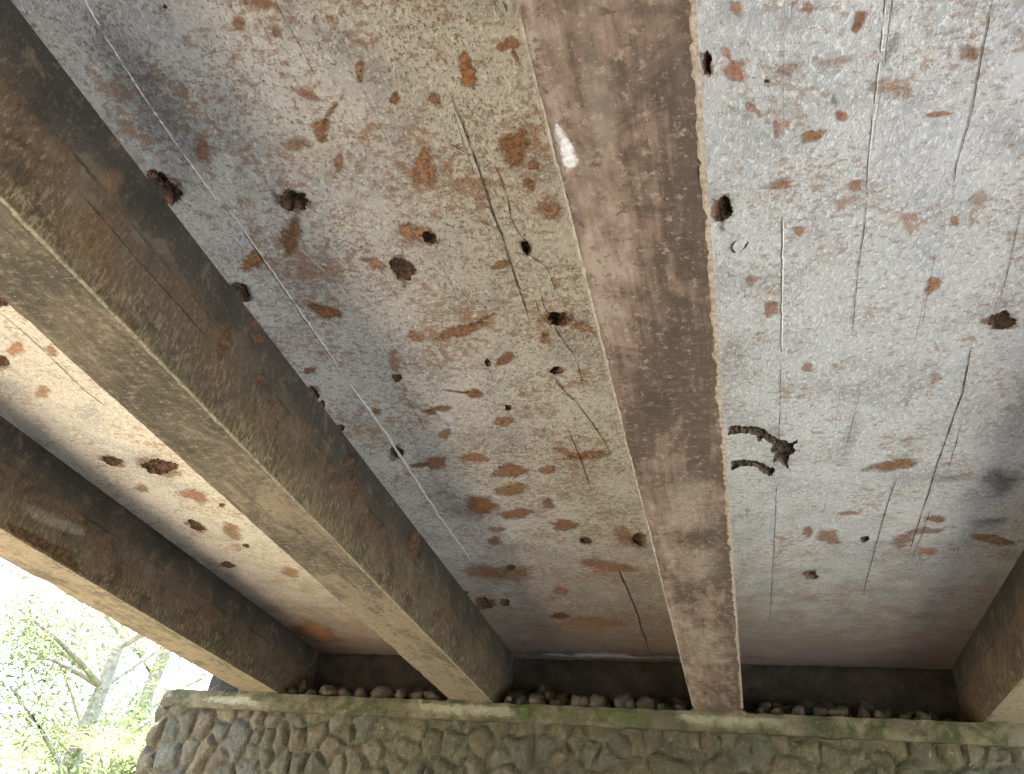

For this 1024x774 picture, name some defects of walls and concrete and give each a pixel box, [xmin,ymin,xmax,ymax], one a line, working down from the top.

rust [459,52,477,87]
crack [954,3,992,180]
rust [499,129,539,191]
spalling [711,195,733,222]
crack [451,96,611,488]
crack [852,202,867,333]
spalling [987,310,1017,330]
spalling [140,458,179,475]
spalling [728,425,798,476]
rust [863,459,918,472]
crack [909,346,972,555]
rust [462,453,555,545]